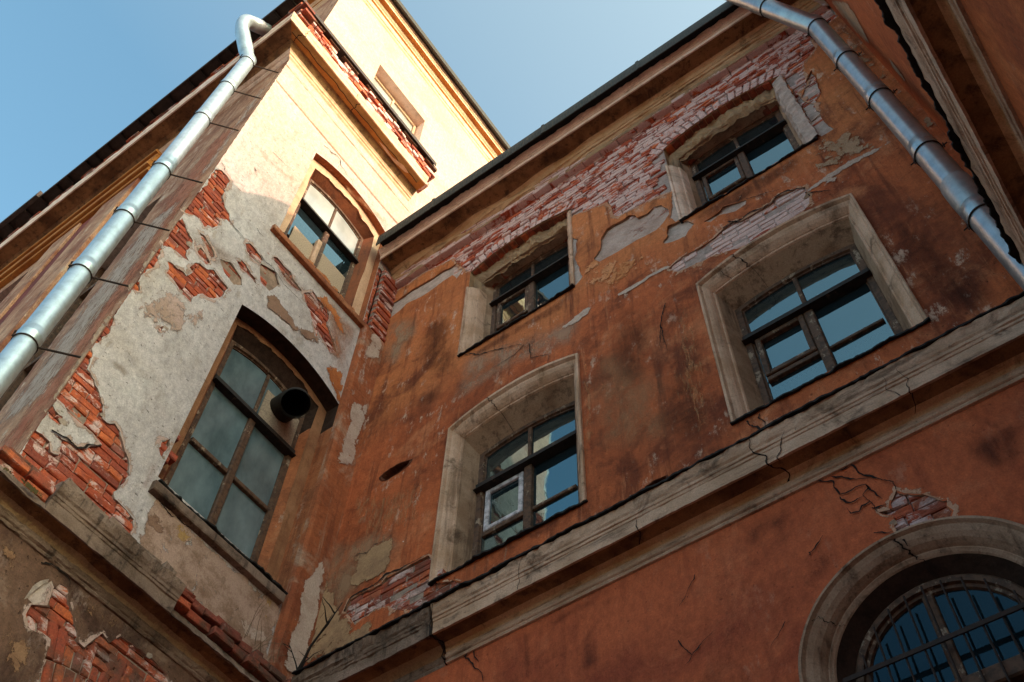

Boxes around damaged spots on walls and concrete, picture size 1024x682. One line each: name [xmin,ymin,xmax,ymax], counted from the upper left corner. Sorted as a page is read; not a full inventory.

flaking render [363,26,886,358]
flaking render [0,83,461,682]
crack [746,414,790,482]
crack [816,464,937,579]
spalling [875,486,960,532]